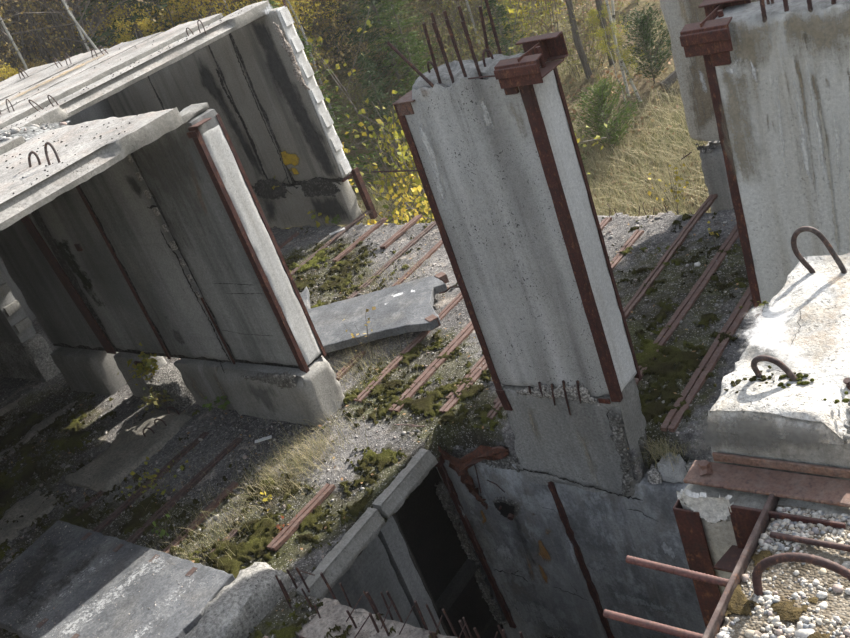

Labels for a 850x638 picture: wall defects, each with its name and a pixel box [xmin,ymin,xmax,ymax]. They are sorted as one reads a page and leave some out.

damp [784,9,850,51]
damp [199,63,262,175]
damp [253,23,335,176]
damp [724,72,754,178]
damp [795,56,840,254]
spalling [516,380,602,415]
spalling [435,482,507,625]
rust [432,445,517,628]
spalling [492,496,519,521]
crack [517,468,658,522]
spalling [676,488,734,524]